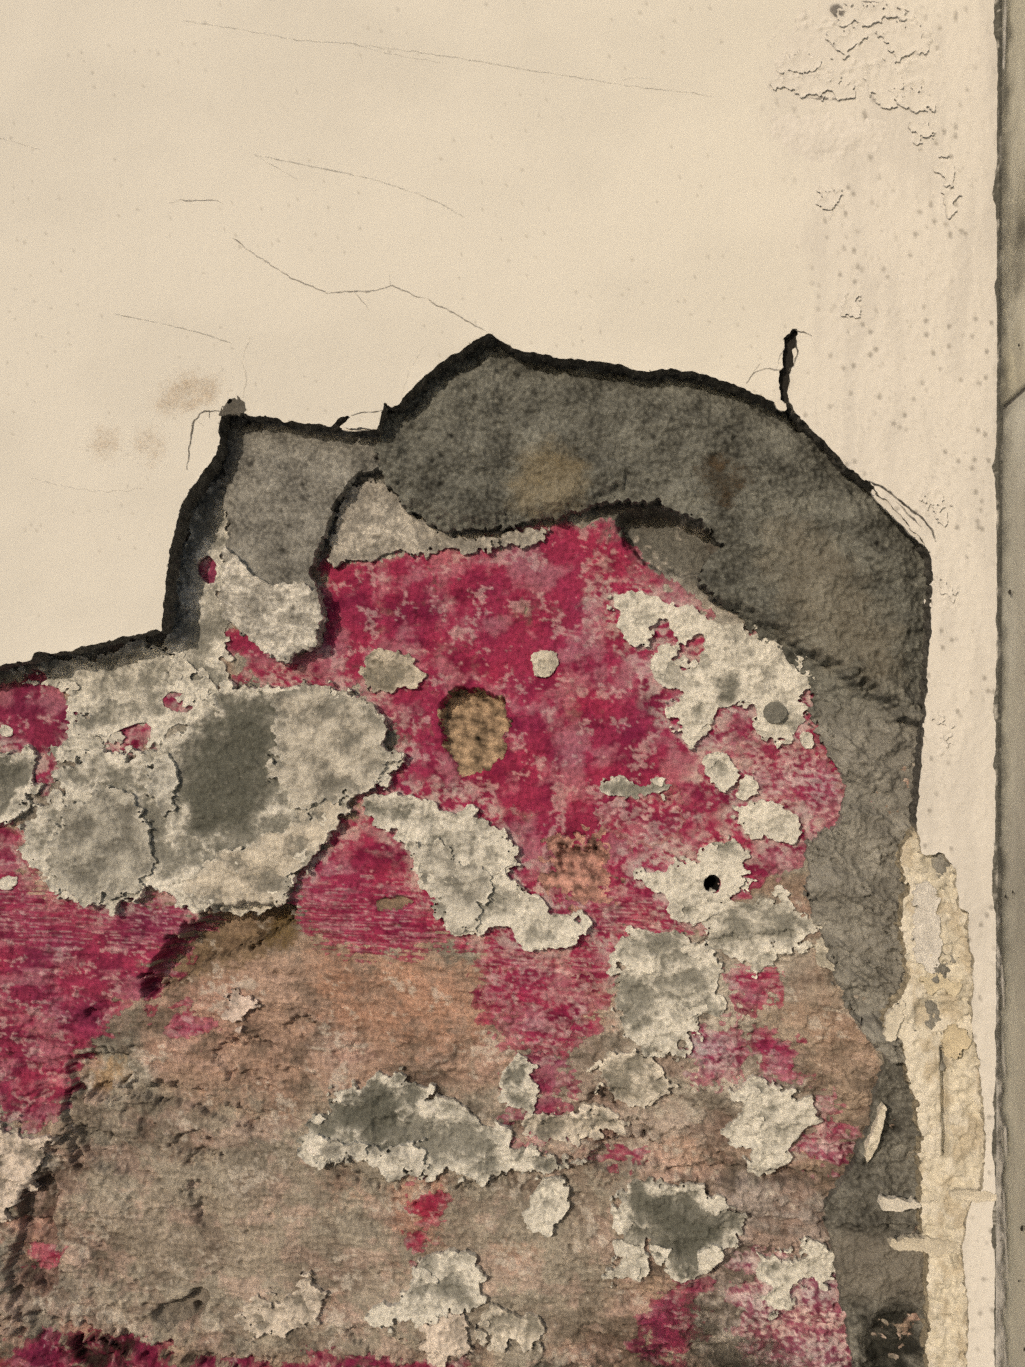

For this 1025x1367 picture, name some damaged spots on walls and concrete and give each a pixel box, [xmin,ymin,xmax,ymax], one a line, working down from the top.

peeling [761,0,963,219]
crack [233,238,482,329]
spalling [0,329,996,1367]